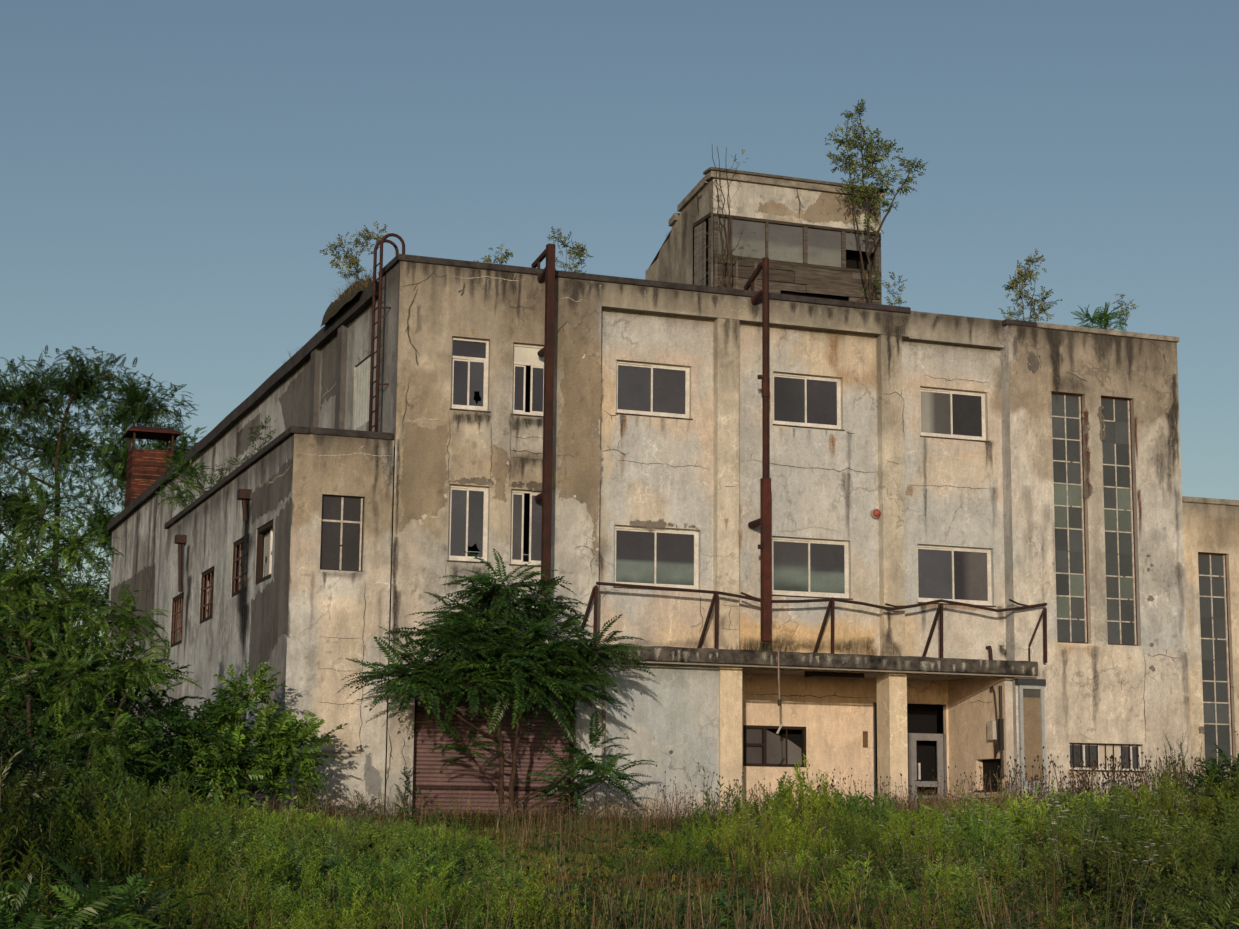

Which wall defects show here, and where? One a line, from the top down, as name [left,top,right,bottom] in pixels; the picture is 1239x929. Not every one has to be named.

peeling [758,192,857,225]
leakage [456,267,521,312]
crack [267,267,524,485]
peeling [398,422,542,532]
peeling [557,352,603,562]
leakage [1014,327,1077,392]
leakage [1095,334,1133,374]
leakage [1158,375,1178,476]
leakage [227,480,252,659]
leakage [749,611,900,664]